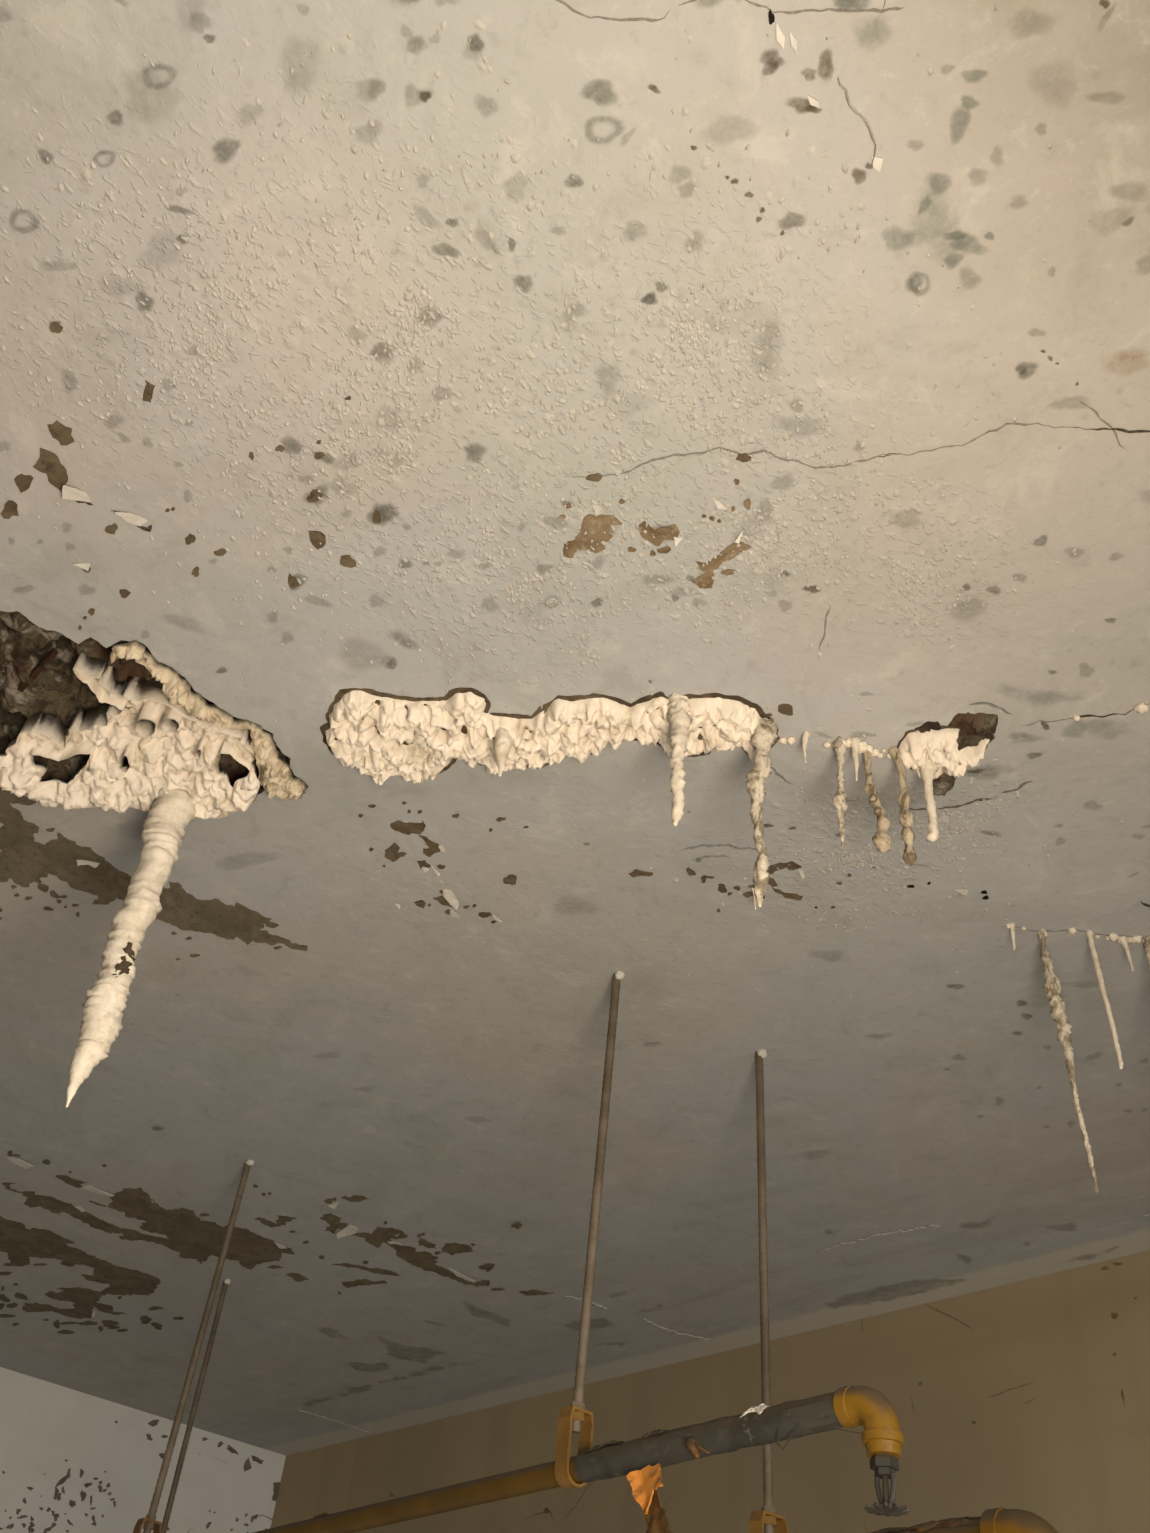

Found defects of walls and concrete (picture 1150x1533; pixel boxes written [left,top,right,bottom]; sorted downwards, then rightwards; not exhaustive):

crack [556,0,696,22]
crack [745,0,904,14]
peeling [143,380,155,403]
peeling [1,421,93,519]
crack [564,401,1150,482]
peeling [309,530,326,550]
spalling [0,608,308,801]
damp [320,687,1032,908]
peeling [0,788,131,920]
damp [0,650,261,1108]
peeling [155,881,308,960]
peeling [0,1459,116,1533]